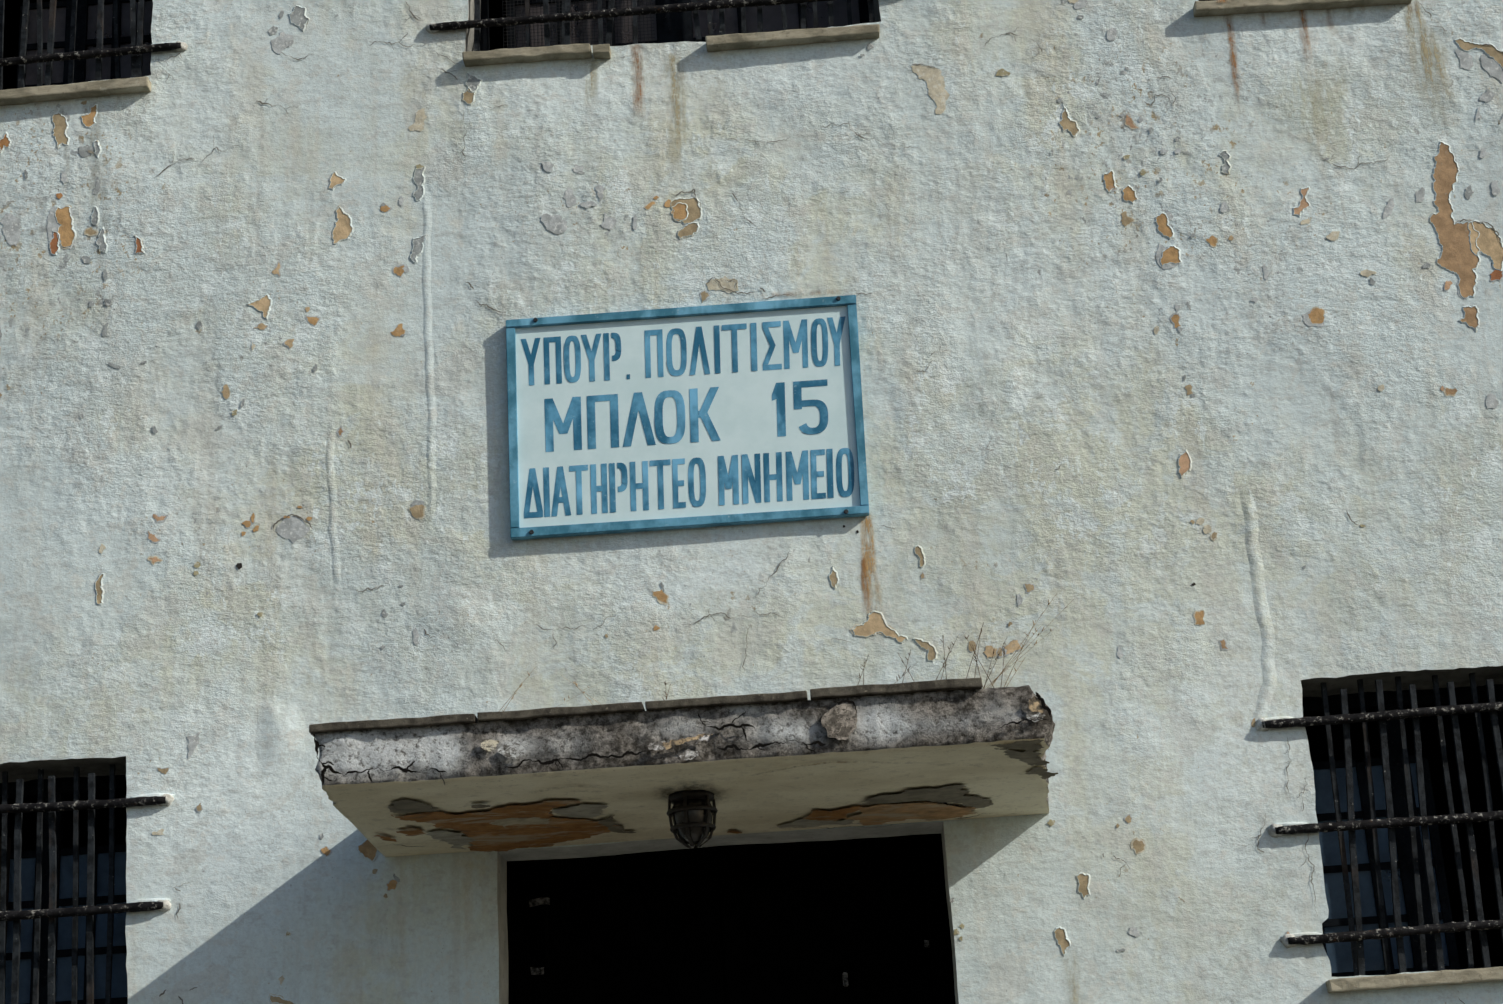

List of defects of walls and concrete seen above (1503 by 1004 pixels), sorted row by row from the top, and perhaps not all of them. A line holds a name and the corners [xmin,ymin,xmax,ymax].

peeling [47,171,108,281]
crack [157,136,243,176]
peeling [670,189,703,240]
peeling [1102,155,1162,226]
peeling [1154,211,1234,269]
peeling [1415,141,1503,333]
crack [683,552,789,672]
crack [311,732,447,785]
crack [503,751,645,770]
crack [698,712,825,752]
spalling [991,692,1058,779]
peeling [357,800,636,898]